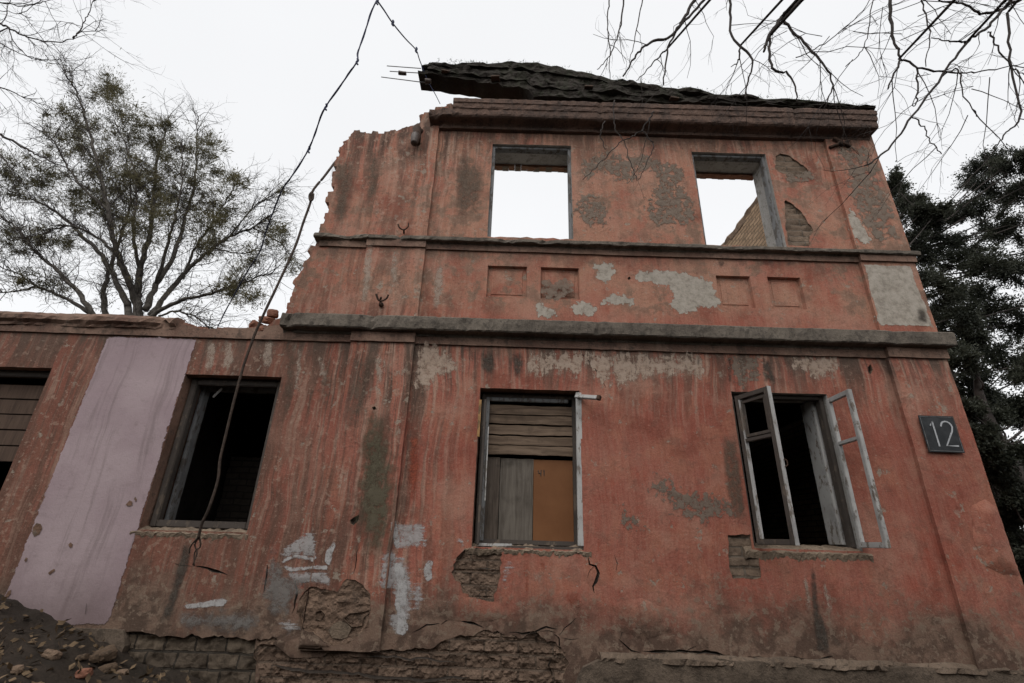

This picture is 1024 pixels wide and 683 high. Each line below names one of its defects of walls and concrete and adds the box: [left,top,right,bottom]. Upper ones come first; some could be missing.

peeling [572,150,698,228]
peeling [628,269,722,314]
peeling [864,265,931,326]
peeling [527,350,705,389]
leakage [358,416,392,546]
peeling [642,472,737,529]
crack [588,558,618,591]
flaking render [128,621,569,683]
crack [414,620,482,632]